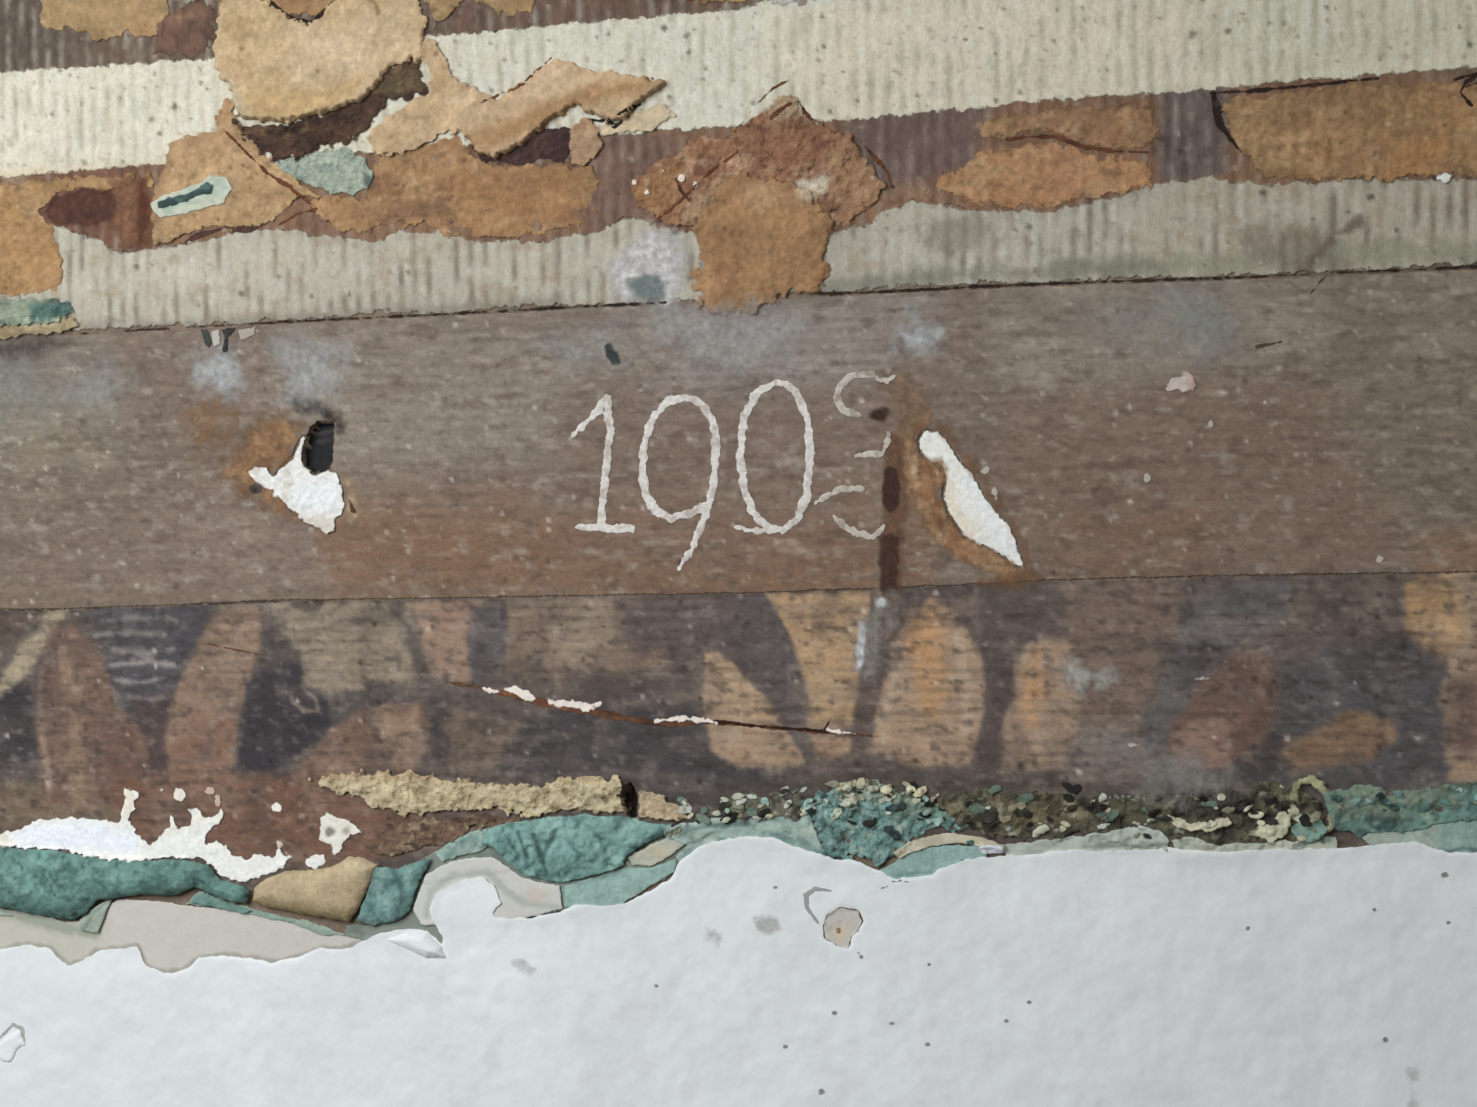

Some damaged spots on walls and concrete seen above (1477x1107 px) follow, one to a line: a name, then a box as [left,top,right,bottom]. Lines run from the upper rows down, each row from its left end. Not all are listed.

flaking render [0,0,676,339]
flaking render [923,99,1159,209]
flaking render [1221,81,1477,183]
flaking render [224,399,358,534]
flaking render [895,409,1034,588]
crack [446,681,877,737]
flaking render [0,769,688,958]
peeling [803,886,862,954]
peeling [800,775,1477,888]